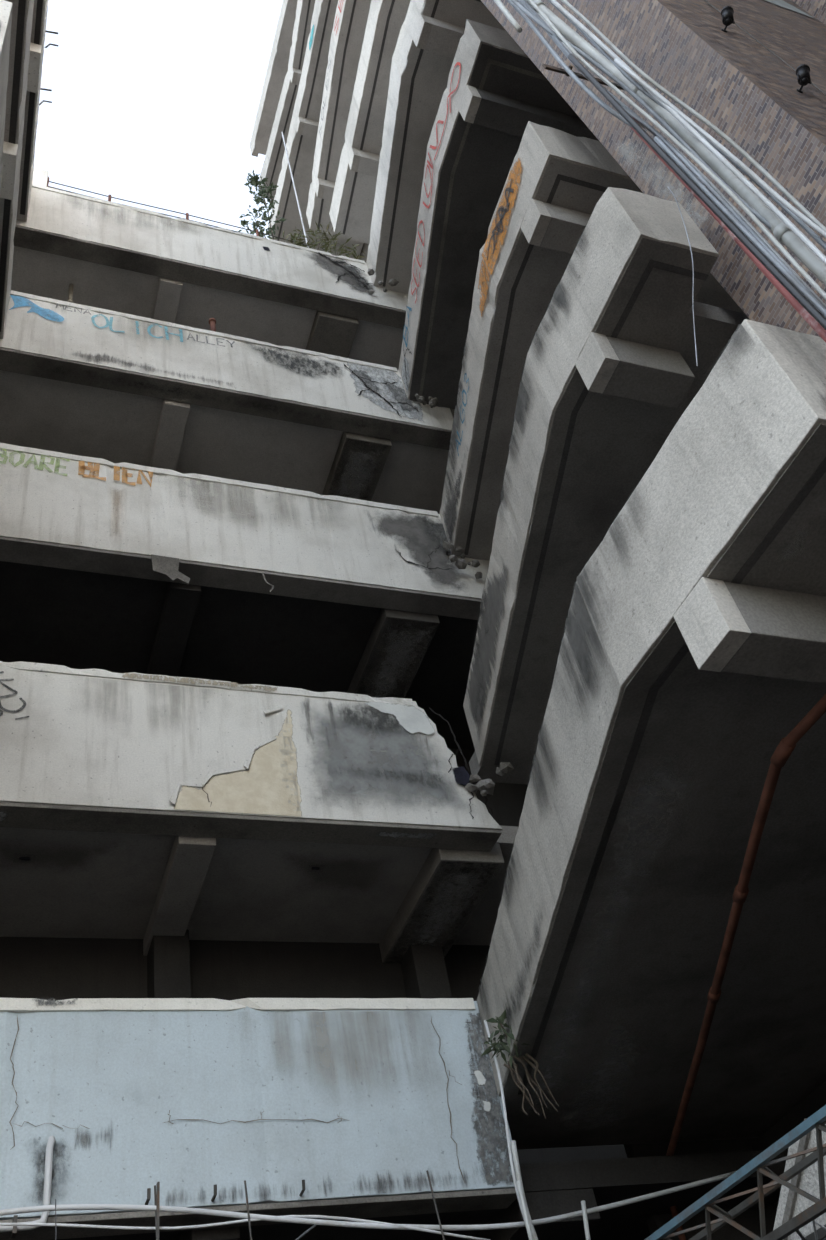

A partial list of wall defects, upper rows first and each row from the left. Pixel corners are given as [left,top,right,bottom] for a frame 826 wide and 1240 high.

spalling [347,357,438,421]
spalling [443,541,482,579]
water stain [304,618,470,801]
peeling [365,702,435,735]
crack [9,1017,90,1150]
crack [164,1110,349,1124]
crack [431,1018,465,1183]
spalling [466,1013,515,1186]
water stain [36,1144,61,1200]
water stain [360,1176,434,1193]